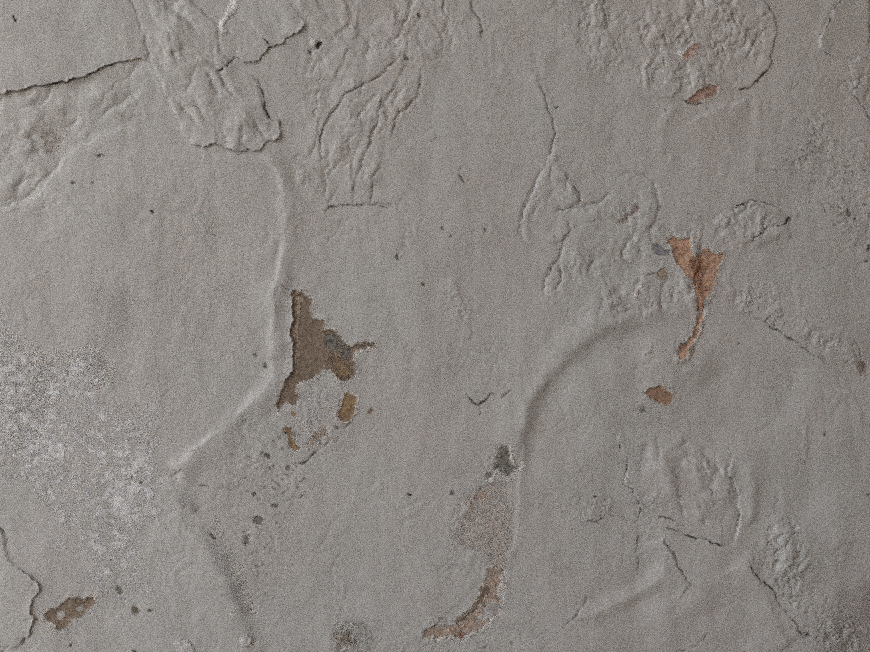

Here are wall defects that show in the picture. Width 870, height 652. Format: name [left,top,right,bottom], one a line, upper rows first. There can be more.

spalling [0,0,163,211]
peeling [683,81,720,105]
spalling [544,173,867,374]
peeling [274,288,377,450]
crack [466,390,510,415]
peeling [639,379,675,412]
crack [745,309,826,362]
peeling [0,530,98,649]
peeling [421,443,525,644]
crack [578,433,754,584]
crack [751,567,811,637]